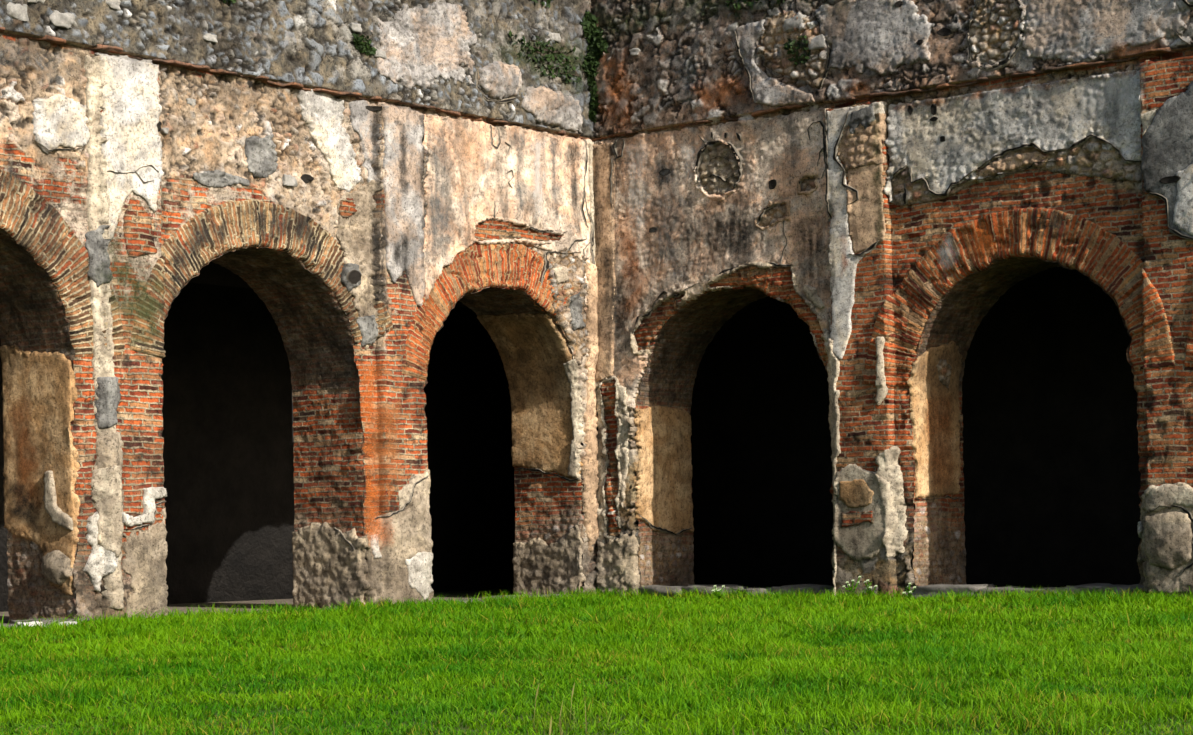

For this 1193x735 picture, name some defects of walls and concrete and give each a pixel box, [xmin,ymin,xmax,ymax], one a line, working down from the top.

leakage [372,112,382,174]
leakage [372,227,410,296]
leakage [400,127,408,189]
leakage [421,137,448,241]
leakage [518,138,578,210]
leakage [593,145,755,335]
flaking render [833,82,1193,240]
flaking render [31,55,168,619]
flaking render [472,201,631,595]
flaking render [630,171,908,594]
flaking render [362,469,434,605]
flaking render [1140,482,1193,595]